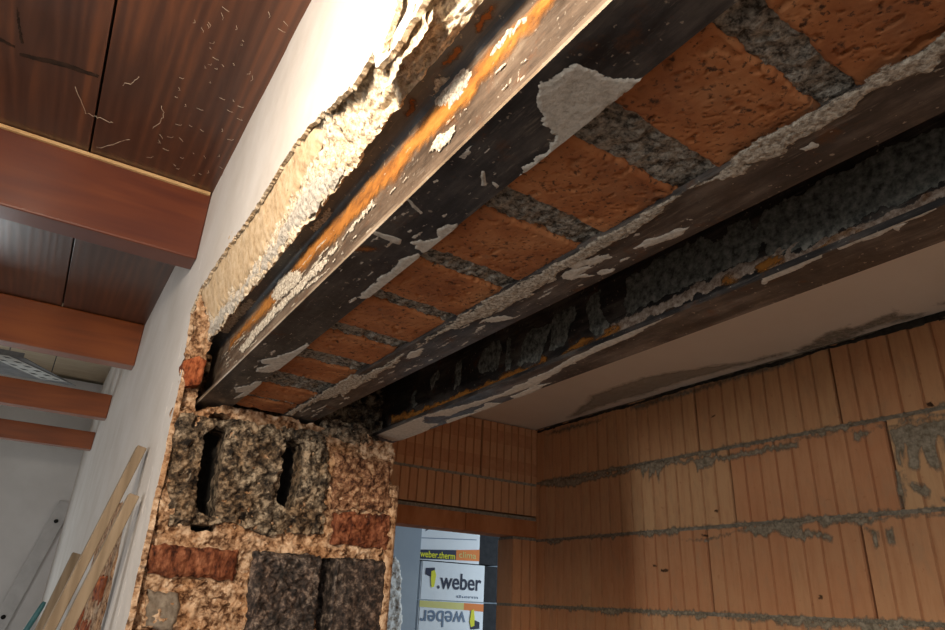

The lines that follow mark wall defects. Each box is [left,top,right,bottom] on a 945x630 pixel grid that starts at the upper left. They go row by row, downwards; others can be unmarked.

crack [0,8,99,78]
spalling [201,0,484,343]
corrosion [292,0,552,273]
corrosion [229,292,276,348]
damp [540,402,945,547]